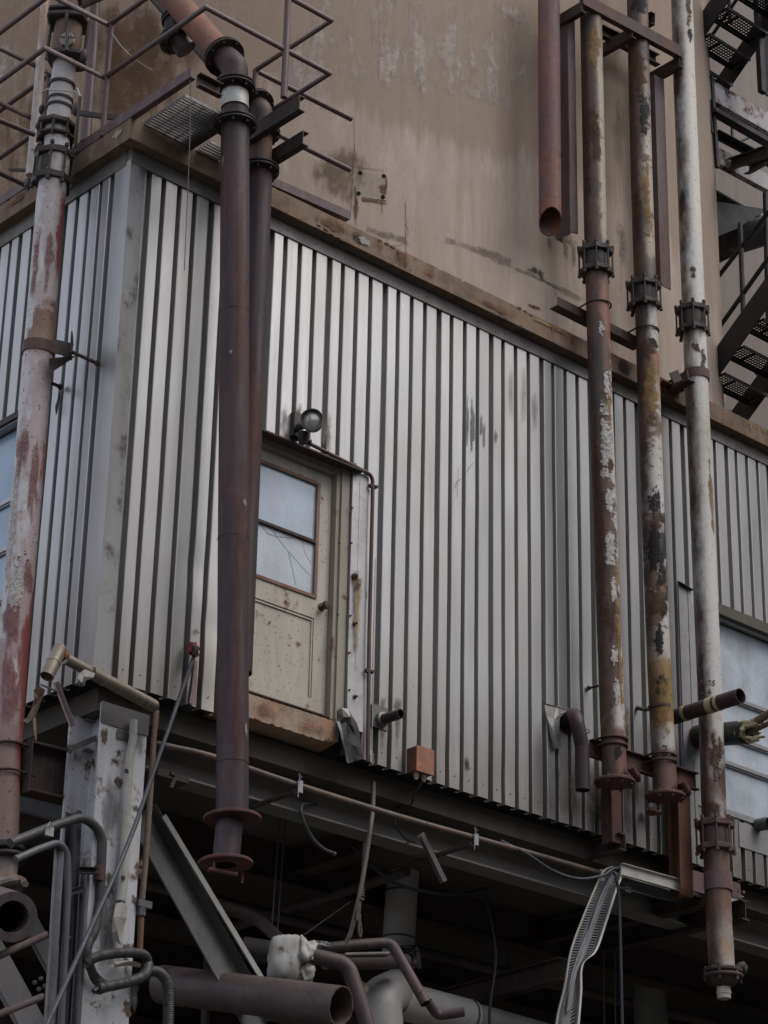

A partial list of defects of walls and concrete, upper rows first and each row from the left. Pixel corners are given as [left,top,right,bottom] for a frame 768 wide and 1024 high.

water stain [472,248,579,298]
corrosion [354,572,367,649]